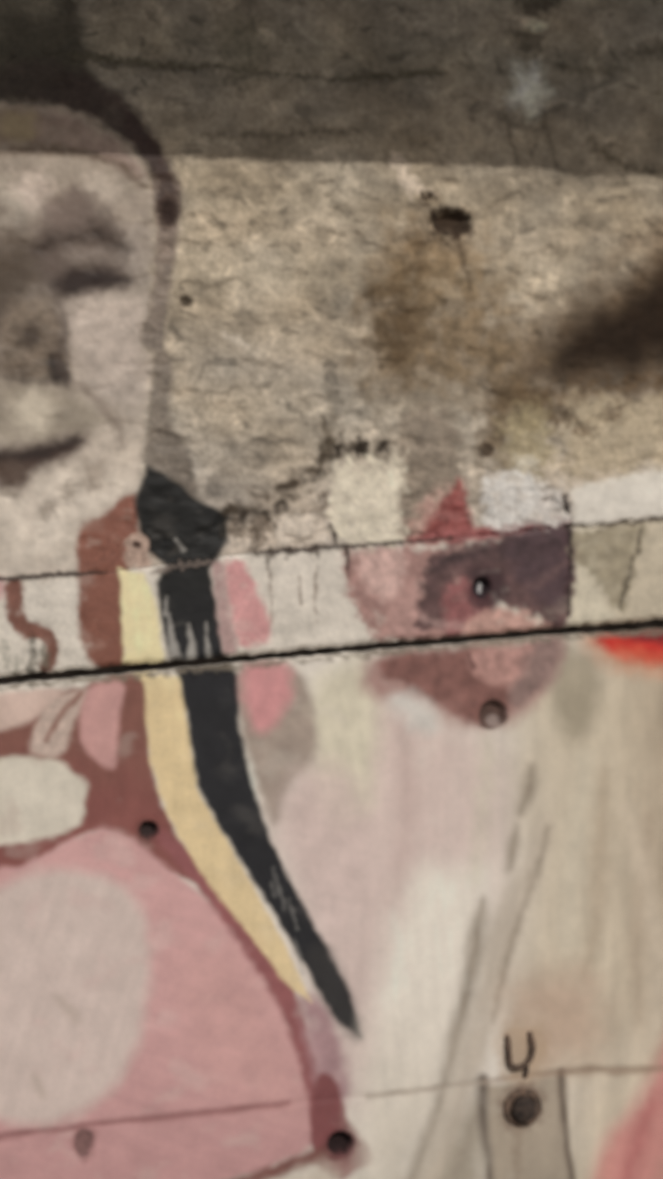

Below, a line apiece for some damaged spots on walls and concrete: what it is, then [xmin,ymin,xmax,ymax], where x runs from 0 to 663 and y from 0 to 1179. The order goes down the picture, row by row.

water stain [217,194,663,556]
crack [0,567,108,585]
crack [257,520,456,628]